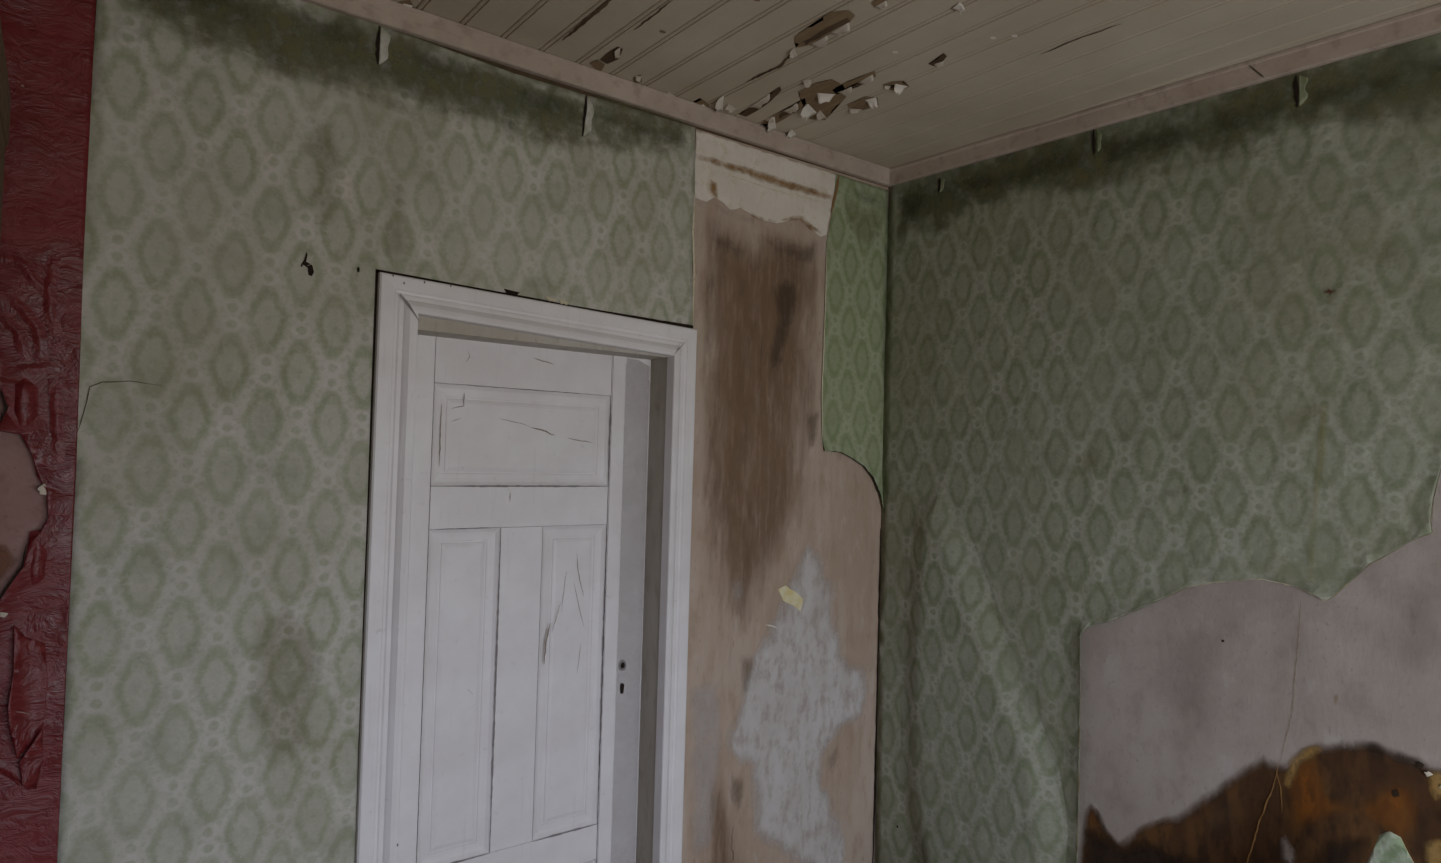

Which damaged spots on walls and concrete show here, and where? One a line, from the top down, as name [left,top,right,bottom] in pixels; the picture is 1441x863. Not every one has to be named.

damp [143,0,682,144]
peeling [590,47,623,71]
peeling [692,71,909,139]
peeling [789,10,855,60]
damp [900,49,1441,233]
damp [717,248,803,597]
peeling [0,387,48,789]
peeling [682,193,884,863]
peeling [1077,469,1441,863]
damp [1082,744,1441,863]
crack [1246,762,1282,863]